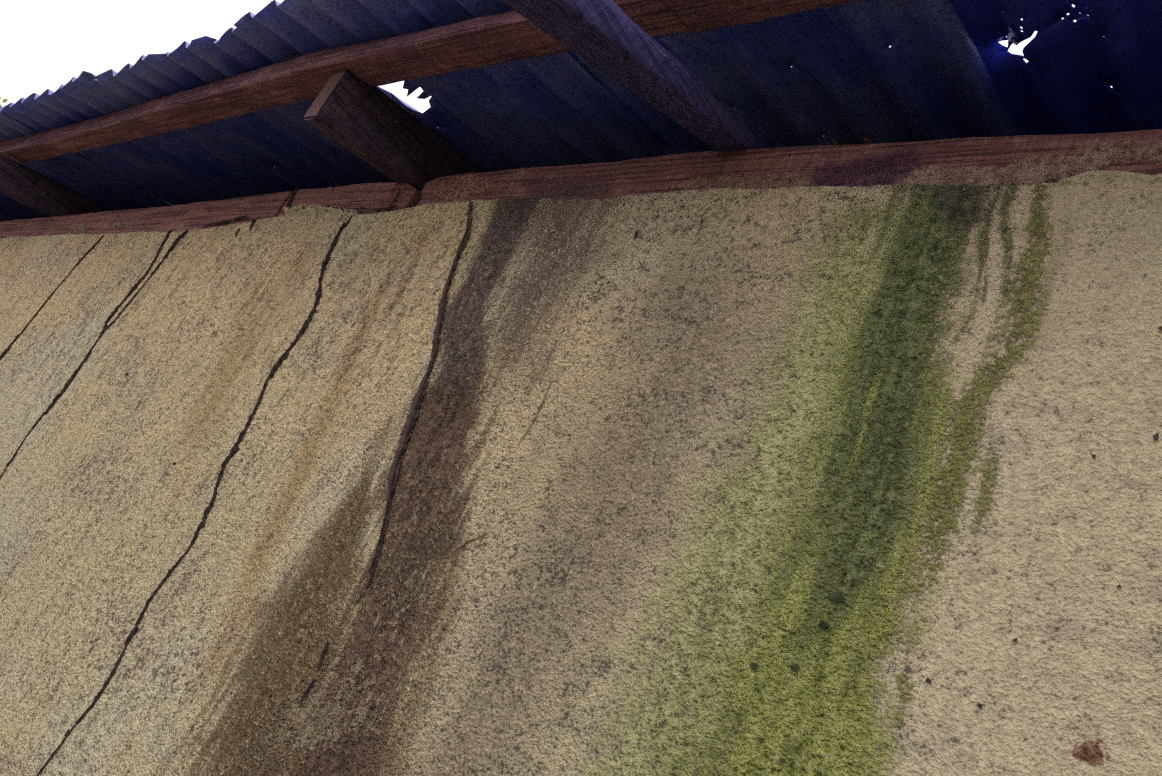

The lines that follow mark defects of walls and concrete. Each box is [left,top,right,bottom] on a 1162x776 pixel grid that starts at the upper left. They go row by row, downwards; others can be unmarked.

crack [0,186,421,776]
water stain [176,196,629,776]
crack [353,200,472,603]
crack [453,532,490,553]
water stain [676,147,1053,776]